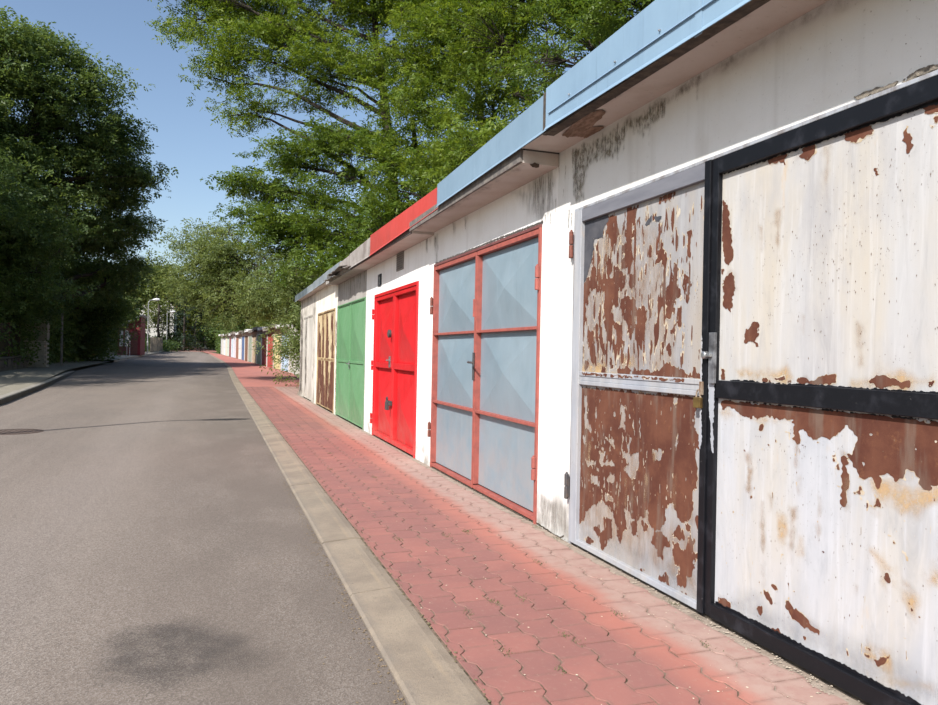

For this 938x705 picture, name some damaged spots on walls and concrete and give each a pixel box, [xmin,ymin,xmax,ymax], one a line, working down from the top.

peeling [854,81,898,100]
water stain [558,102,665,198]
rust [844,125,874,144]
rust [890,126,925,166]
rust [922,104,938,129]
rust [721,200,735,312]
rust [744,322,760,347]
rust [579,192,704,595]
rust [762,371,837,385]
rust [868,375,911,389]
rust [720,400,938,511]
rust [749,552,827,640]